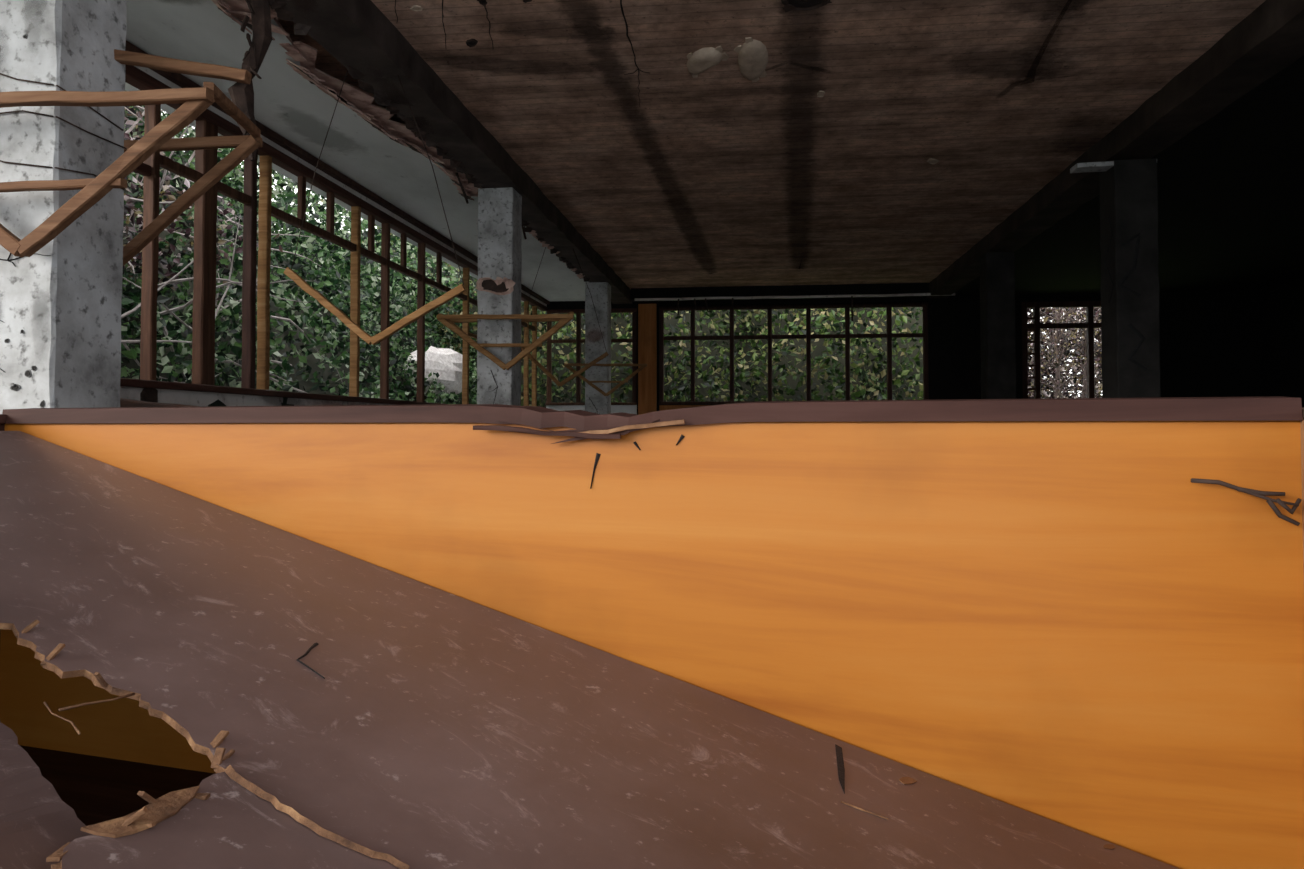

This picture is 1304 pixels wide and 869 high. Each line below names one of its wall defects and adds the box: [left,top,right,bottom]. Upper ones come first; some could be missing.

flaking render [211,0,253,34]
flaking render [268,0,480,201]
crack [590,453,601,489]